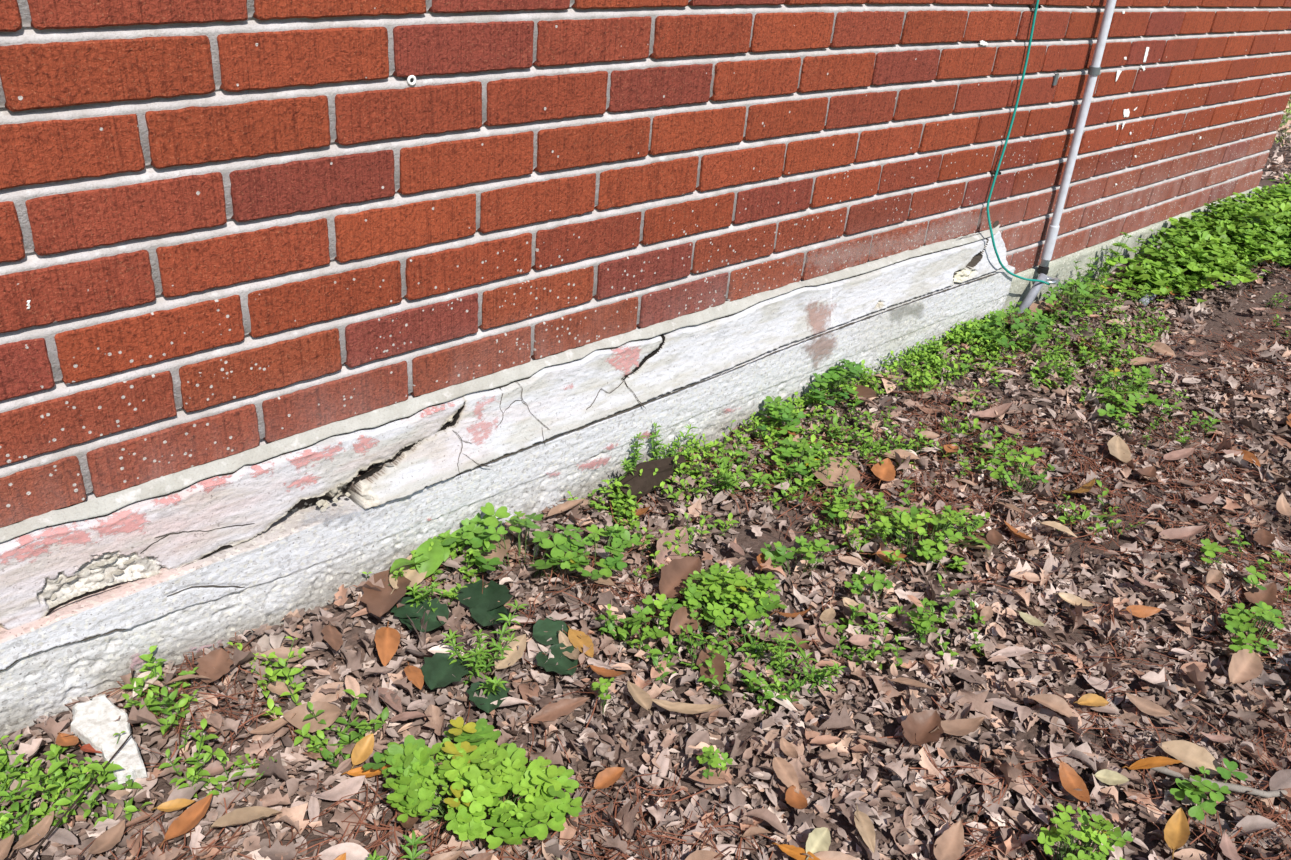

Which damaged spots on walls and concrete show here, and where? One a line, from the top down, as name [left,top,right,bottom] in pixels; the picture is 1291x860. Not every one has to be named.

spalling [953,267,978,285]
crack [1,232,999,543]
peeling [251,435,379,492]
spalling [0,475,233,616]
crack [140,523,255,554]
crack [168,585,243,596]